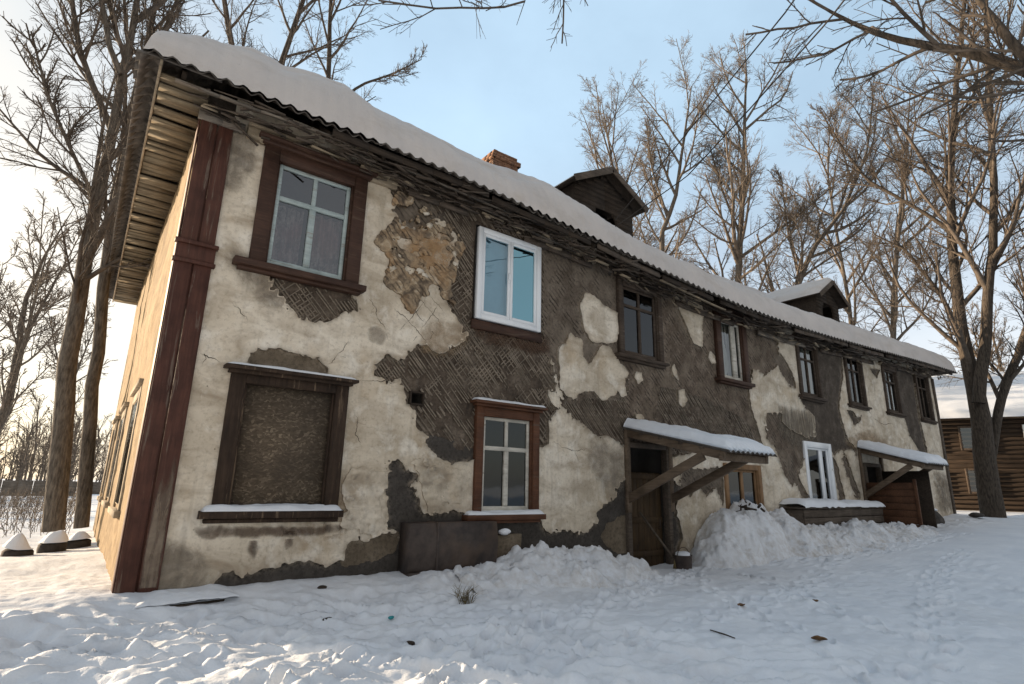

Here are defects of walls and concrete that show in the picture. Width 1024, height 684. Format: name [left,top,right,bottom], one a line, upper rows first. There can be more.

flaking render [391,190,447,229]
flaking render [247,348,328,376]
flaking render [540,217,860,500]
flaking render [897,367,926,452]
flaking render [425,435,473,464]
flaking render [214,459,463,586]
flaking render [497,481,627,558]